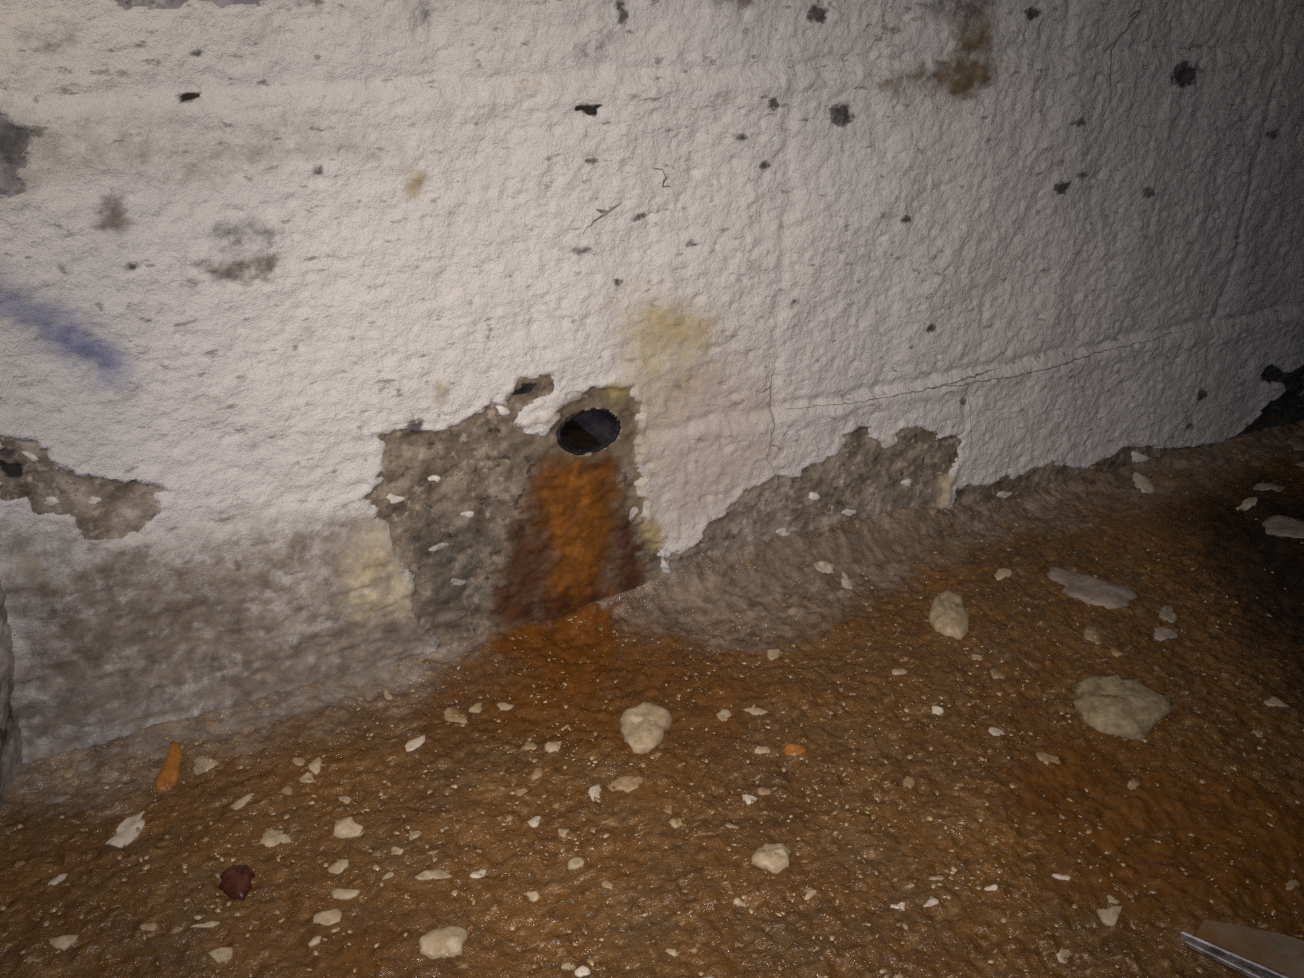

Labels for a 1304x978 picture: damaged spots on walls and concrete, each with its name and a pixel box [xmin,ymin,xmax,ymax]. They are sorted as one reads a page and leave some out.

peeling [1235,364,1304,467]
peeling [0,435,165,540]
peeling [364,374,1212,646]
peeling [1235,482,1286,511]
corrosion [448,455,745,742]
peeling [1083,625,1127,657]